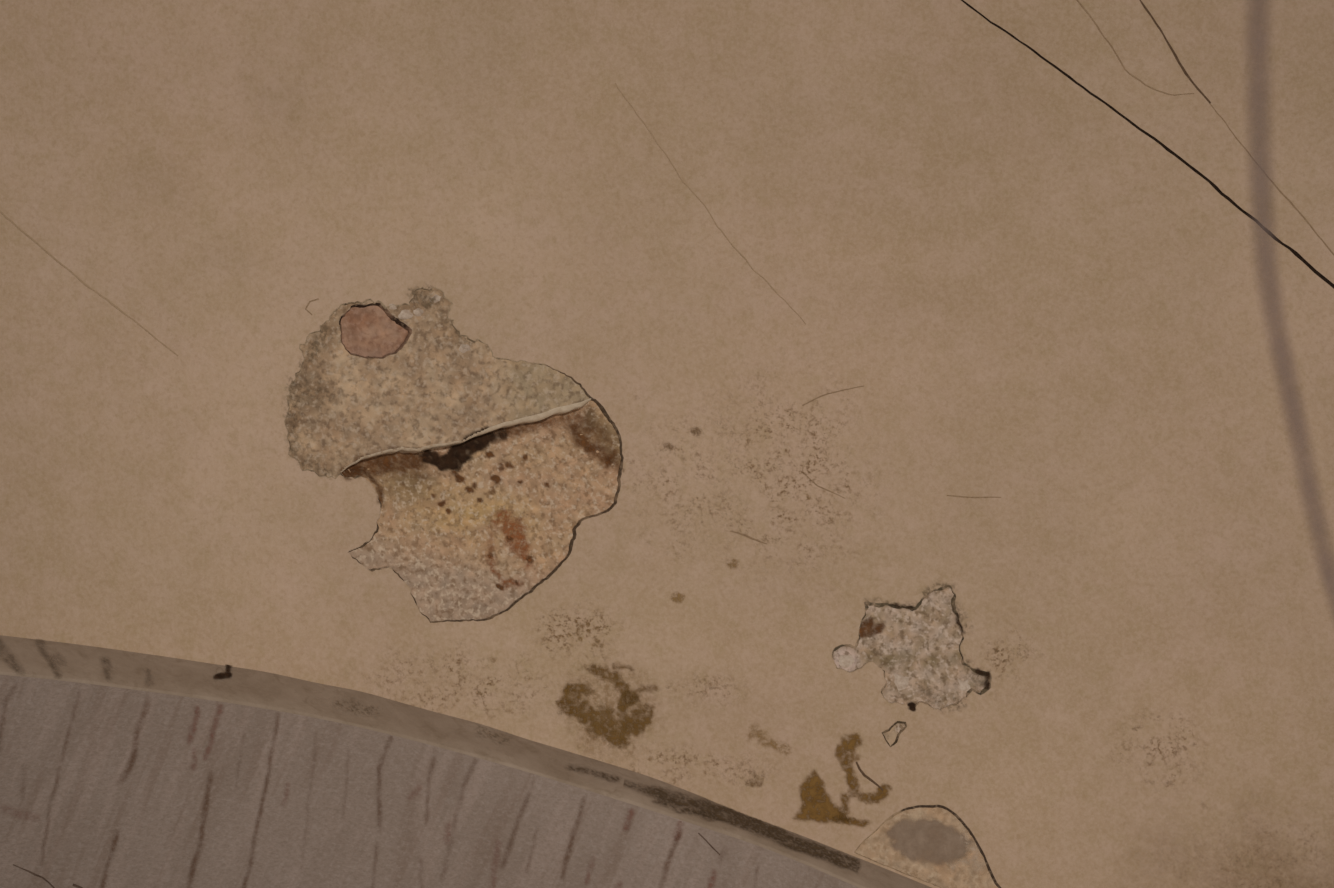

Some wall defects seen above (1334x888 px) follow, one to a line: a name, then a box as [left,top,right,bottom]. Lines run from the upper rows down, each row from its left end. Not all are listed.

crack [961,0,1334,289]
flaking render [284,287,624,623]
leakage [557,664,655,748]
flaking render [832,585,992,747]
leakage [571,767,860,869]
leakage [797,734,890,826]
peeling [854,805,1001,888]